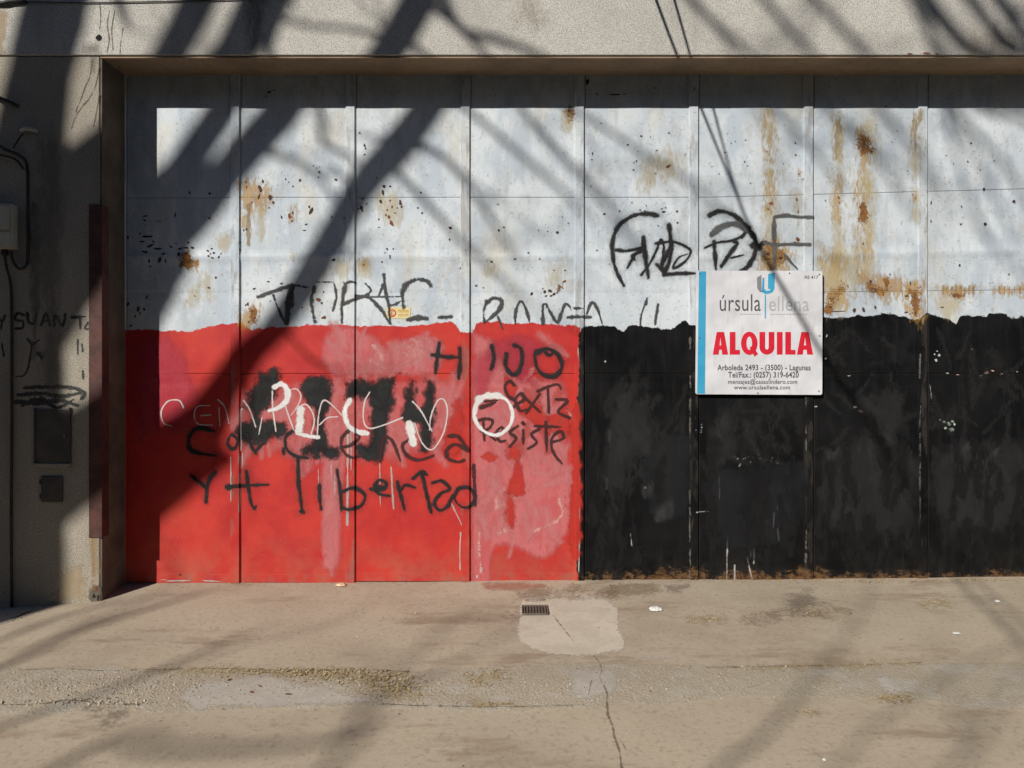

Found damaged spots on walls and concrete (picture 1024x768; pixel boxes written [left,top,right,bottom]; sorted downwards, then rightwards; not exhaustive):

corrosion [179,250,198,269]
corrosion [240,304,261,328]
corrosion [238,180,274,250]
corrosion [821,131,925,320]
corrosion [942,284,975,298]
crack [556,658,625,768]